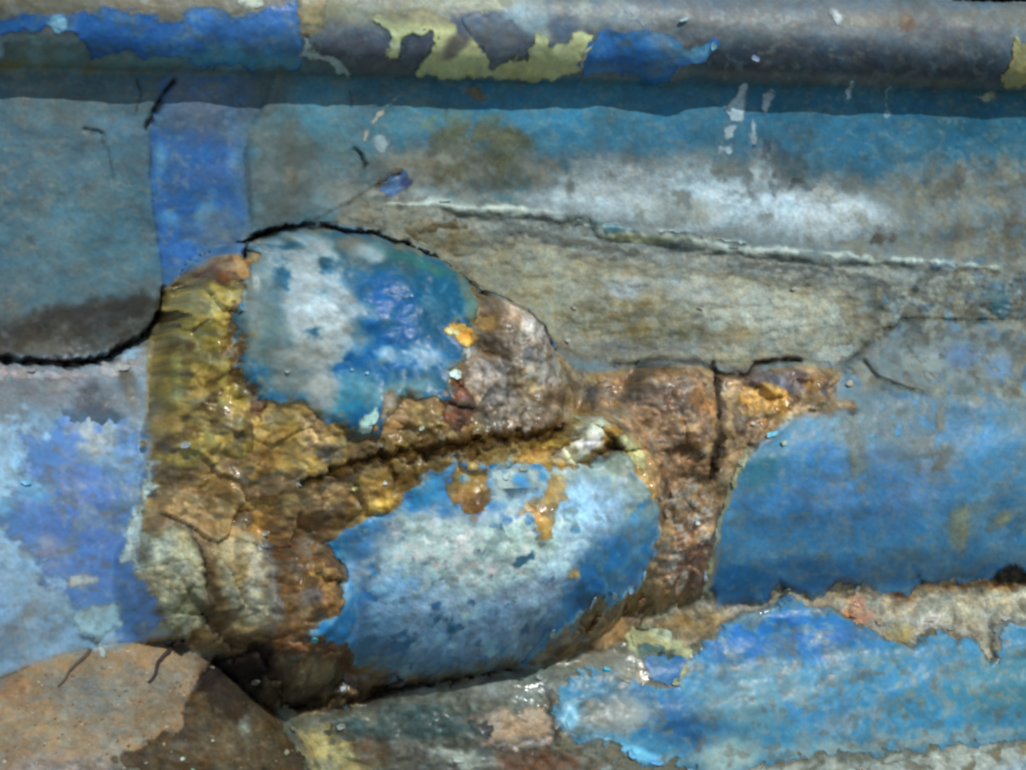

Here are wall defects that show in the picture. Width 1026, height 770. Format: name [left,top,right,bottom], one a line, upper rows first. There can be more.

crack [0,295,162,367]
corrosion [140,254,352,487]
crack [242,221,557,349]
corrosion [341,370,717,595]
peeling [231,168,1012,490]
crack [657,356,776,481]
corrosion [258,531,355,671]
peeling [305,449,662,677]
peeling [466,449,1026,770]
damp [111,654,305,770]
damp [341,716,483,740]
damp [429,748,483,770]